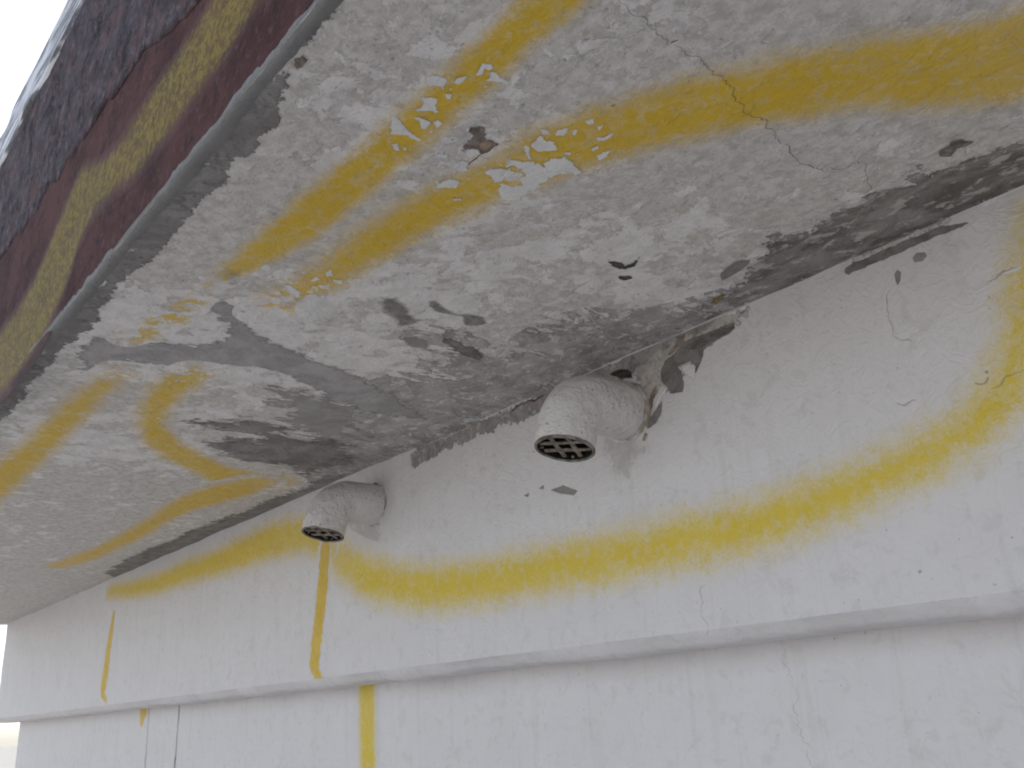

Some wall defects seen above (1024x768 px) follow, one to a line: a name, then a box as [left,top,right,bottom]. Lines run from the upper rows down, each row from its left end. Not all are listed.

peeling [0,10,1024,493]
leakage [377,296,488,348]
leakage [442,338,482,360]